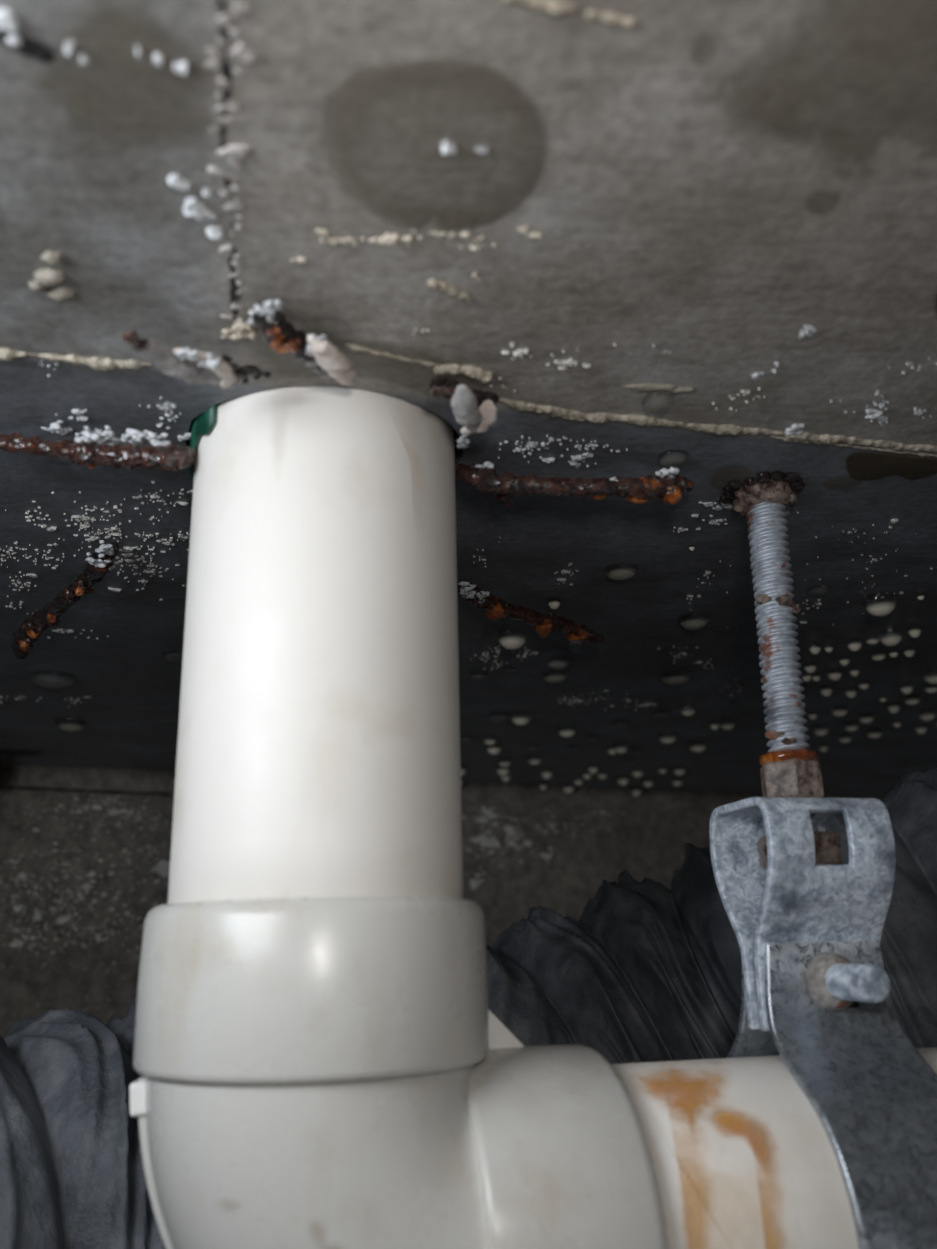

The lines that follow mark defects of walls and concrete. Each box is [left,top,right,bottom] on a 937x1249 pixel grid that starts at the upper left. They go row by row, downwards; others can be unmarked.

leakage [328,61,545,171]
crack [204,0,263,340]
leakage [315,145,520,251]
leakage [518,224,542,239]
peeling [172,348,236,388]
peeling [304,334,356,386]
peeling [460,400,497,435]
leakage [846,452,937,481]
leakage [0,481,193,614]
leakage [831,519,899,593]
leakage [458,581,489,604]
crack [0,749,170,795]